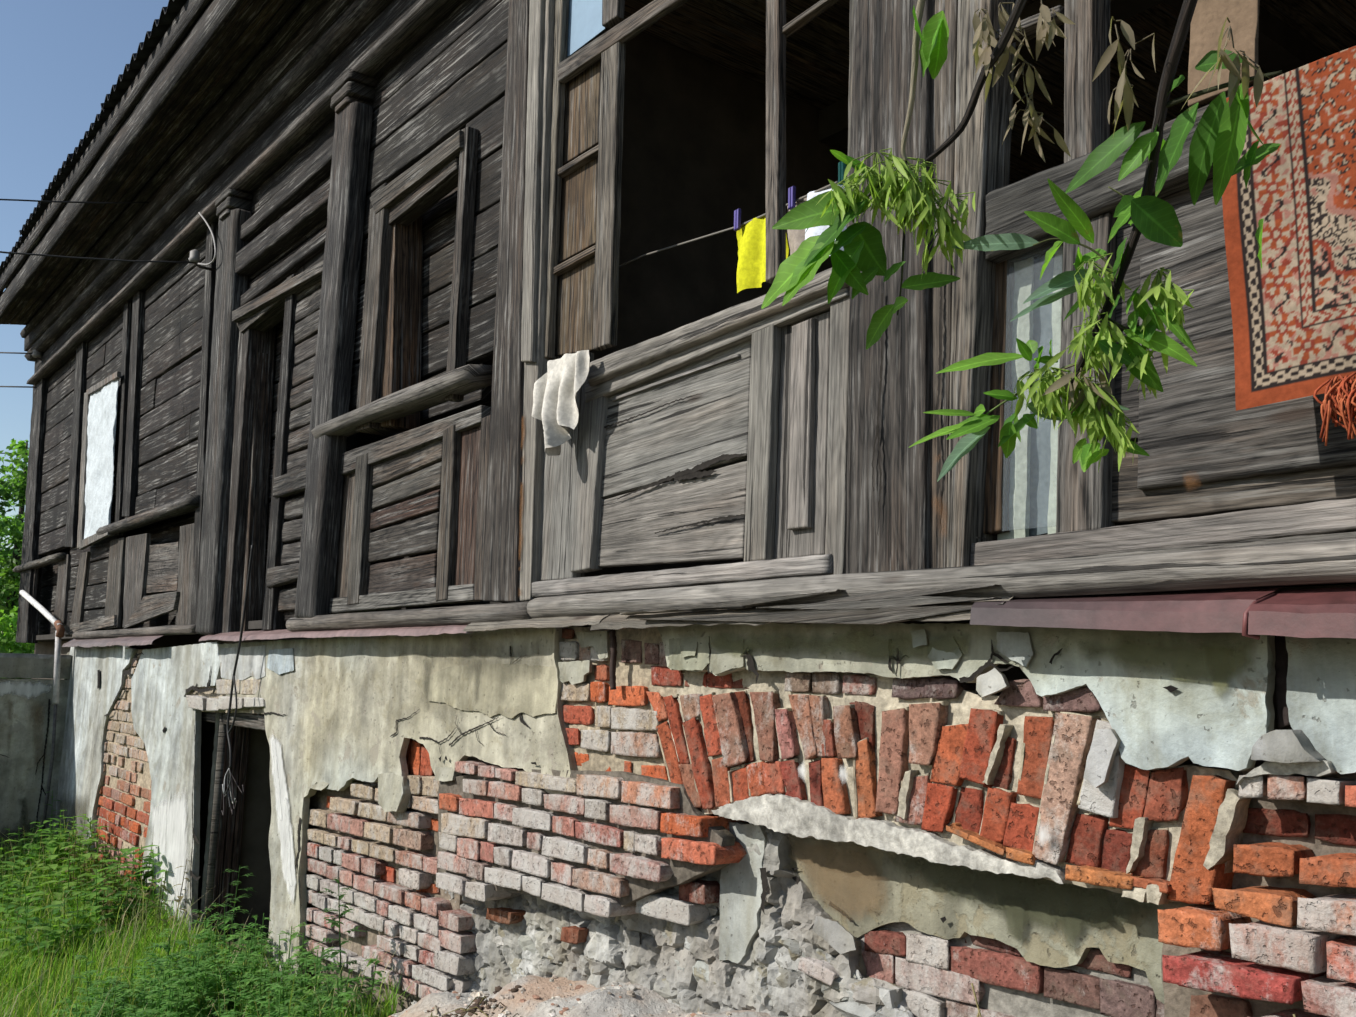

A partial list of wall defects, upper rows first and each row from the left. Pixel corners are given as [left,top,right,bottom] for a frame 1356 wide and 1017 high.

spalling [94,649,151,882]
crack [390,709,529,754]
spalling [305,626,1356,1017]